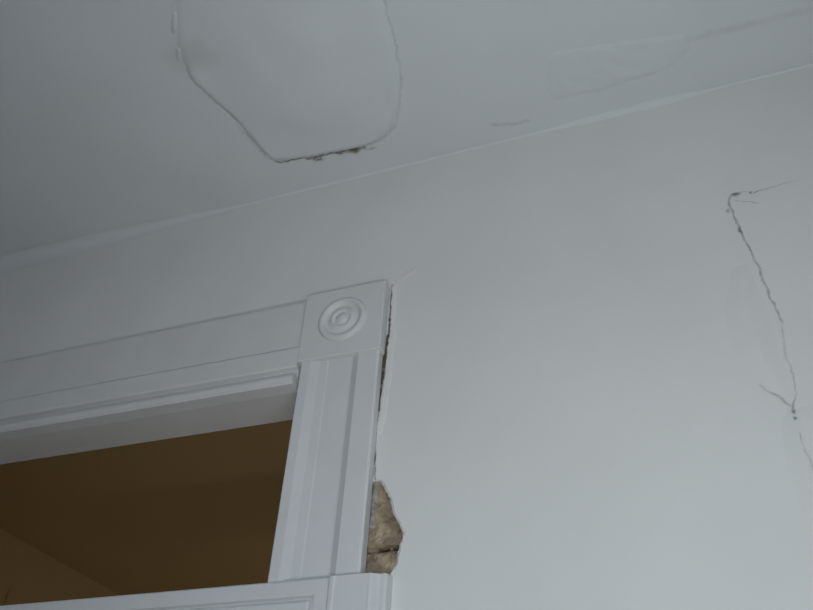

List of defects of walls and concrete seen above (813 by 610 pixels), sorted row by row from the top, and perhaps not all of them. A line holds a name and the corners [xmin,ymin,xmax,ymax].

crack [277,148,359,163]
flaking render [365,478,405,575]